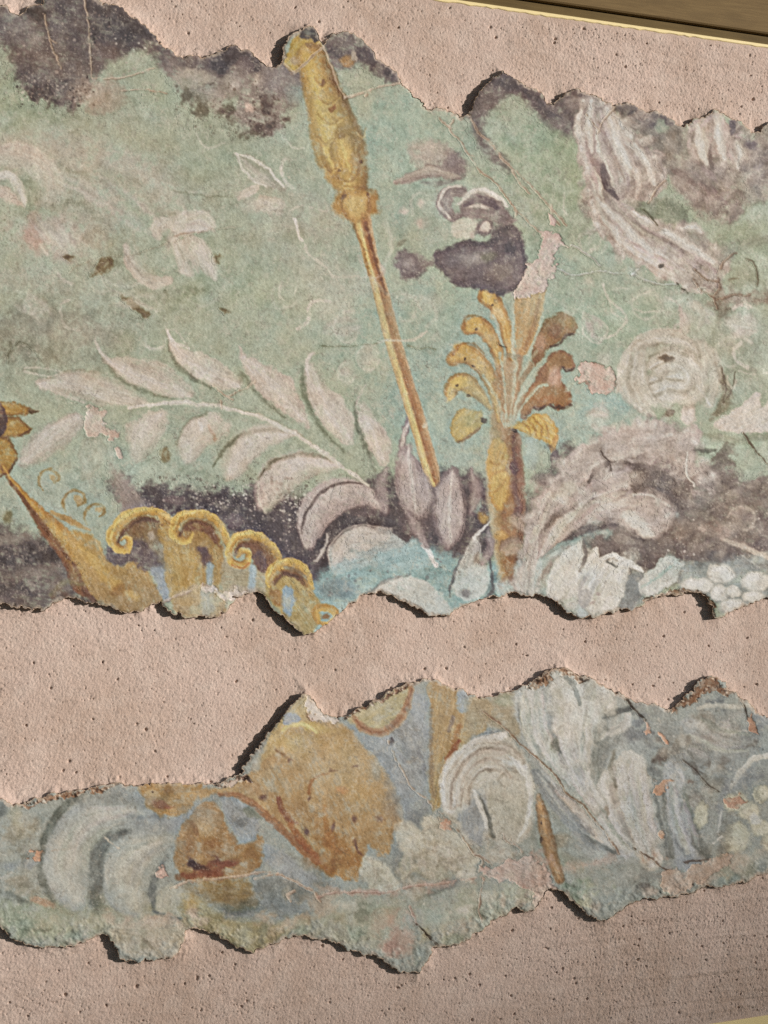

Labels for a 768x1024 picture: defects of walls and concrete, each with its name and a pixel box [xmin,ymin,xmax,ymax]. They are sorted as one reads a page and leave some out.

flaking render [513,212,572,300]
flaking render [574,360,618,396]
flaking render [81,403,124,460]
flaking render [201,580,253,602]
spalling [642,587,718,618]
flaking render [304,682,416,725]
spalling [526,668,591,691]
spalling [667,676,736,715]
spalling [16,783,121,811]
crack [481,710,709,870]
flaking render [478,855,558,910]